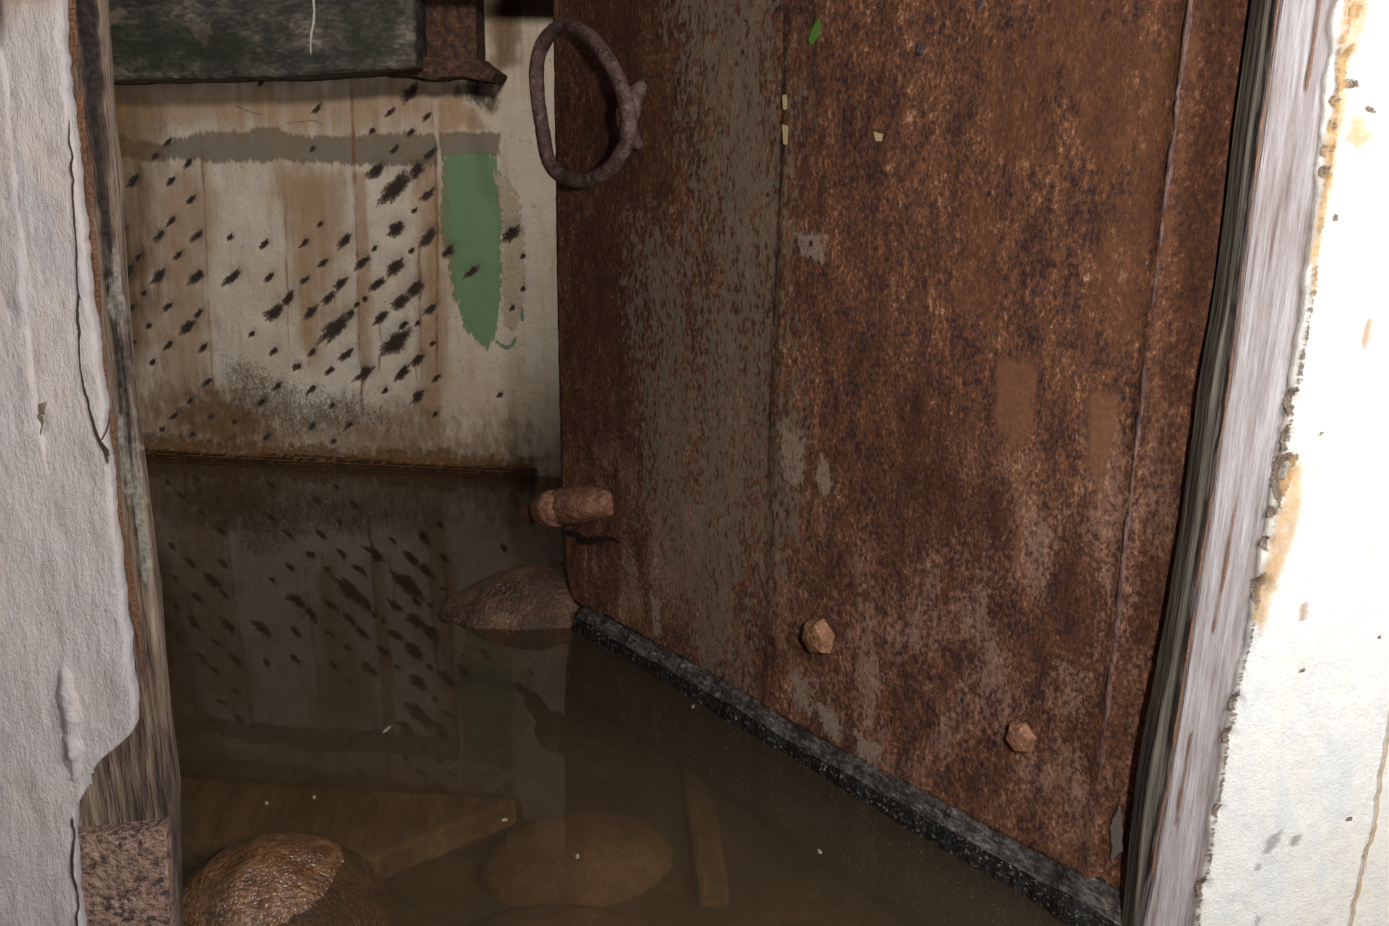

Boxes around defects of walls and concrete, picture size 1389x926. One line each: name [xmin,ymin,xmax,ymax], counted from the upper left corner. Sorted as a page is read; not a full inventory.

crack [68,121,110,464]
damp [116,101,149,354]
damp [143,392,538,545]
mould [454,83,495,112]
spalling [1267,255,1319,519]
spalling [1318,0,1376,236]
spalling [1196,572,1266,926]
crack [1350,736,1389,926]